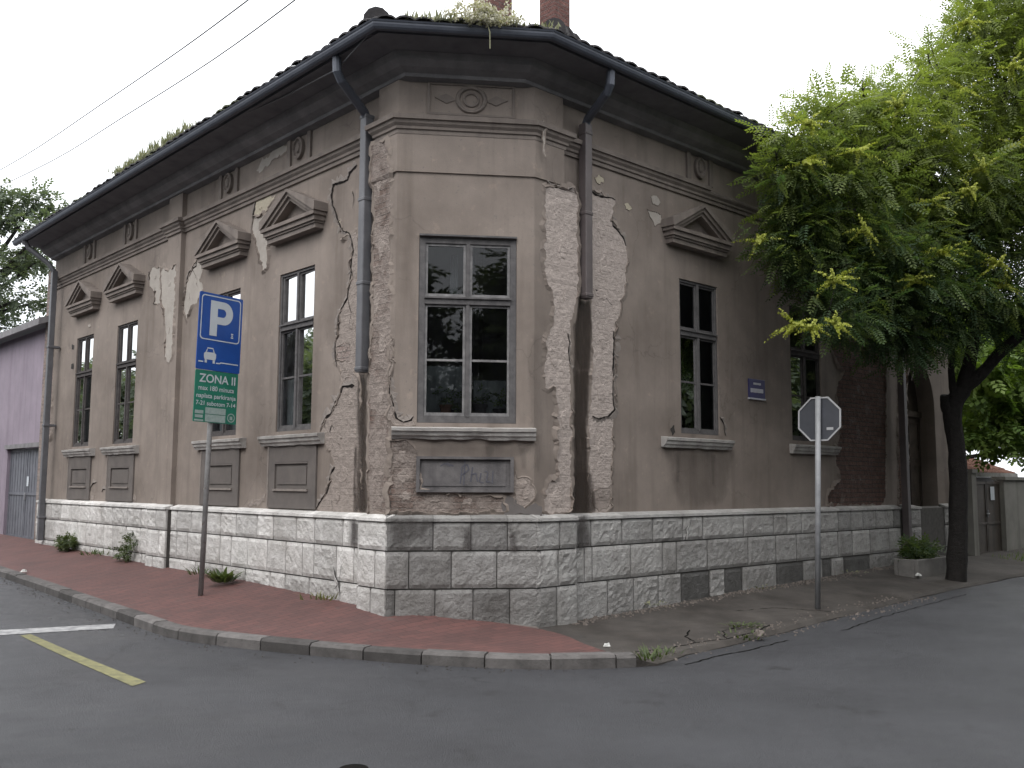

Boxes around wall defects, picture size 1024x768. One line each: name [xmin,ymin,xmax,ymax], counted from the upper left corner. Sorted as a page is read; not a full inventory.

flaking render [250,194,276,275]
flaking render [647,195,662,227]
flaking render [149,259,205,365]
crack [319,161,357,431]
flaking render [316,135,632,516]
flaking render [825,333,888,507]
crack [316,464,335,509]